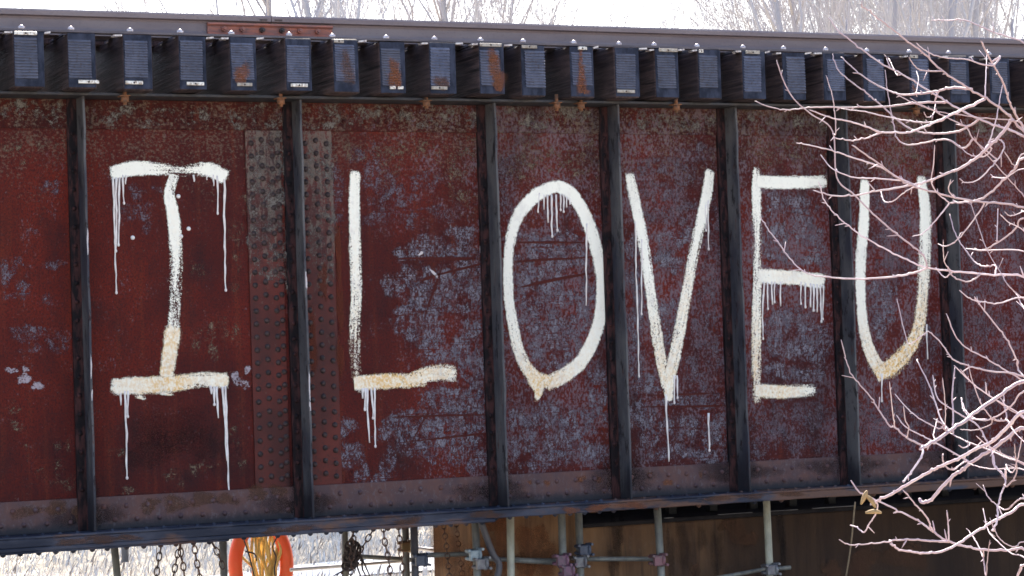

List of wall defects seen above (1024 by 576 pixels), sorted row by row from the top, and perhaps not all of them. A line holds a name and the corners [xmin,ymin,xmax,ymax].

rust [388,58,403,87]
rust [487,47,507,92]
rust [562,502,647,514]